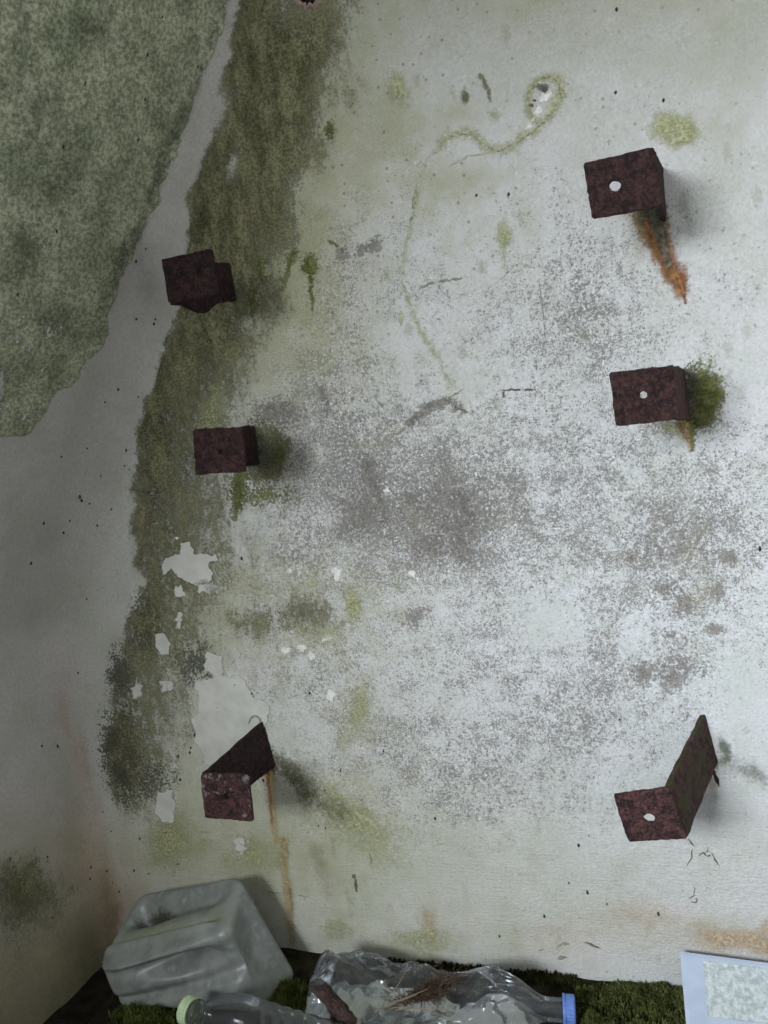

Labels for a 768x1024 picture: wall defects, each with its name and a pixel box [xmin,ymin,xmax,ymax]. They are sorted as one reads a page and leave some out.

damp [185,0,266,252]
damp [329,234,383,264]
rust [630,206,687,304]
damp [230,471,249,521]
peeling [162,537,227,597]
peeling [130,677,143,699]
damp [97,642,179,811]
peeling [155,633,171,655]
peeling [159,680,174,692]
damp [174,638,213,691]
peeling [191,652,270,766]
rust [266,770,293,939]